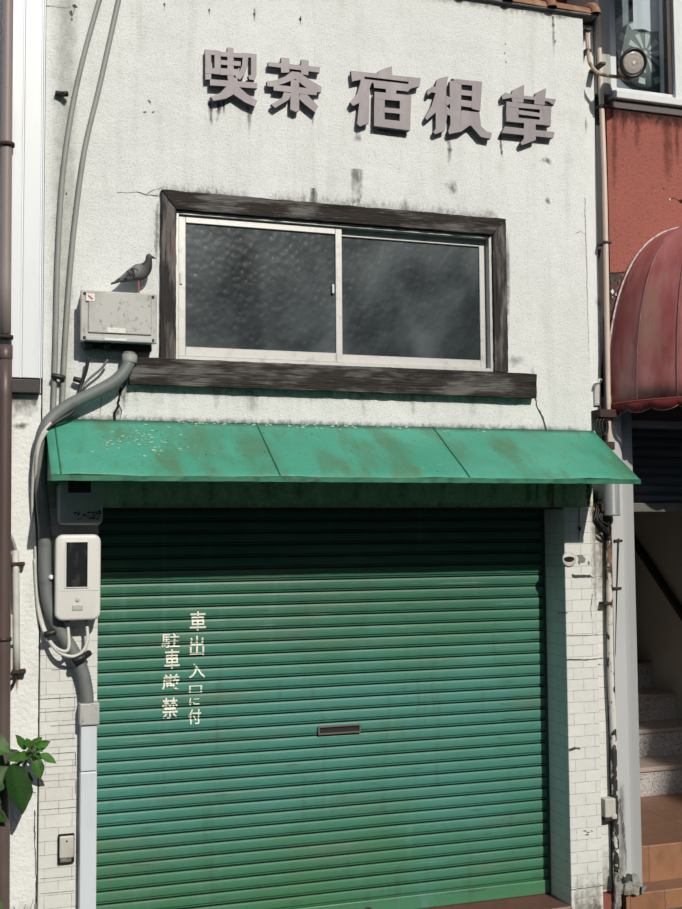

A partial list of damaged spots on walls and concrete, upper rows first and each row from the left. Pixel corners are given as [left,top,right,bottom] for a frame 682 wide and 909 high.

water stain [612,109,682,125]
crack [100,381,126,420]
spalling [612,798,646,909]